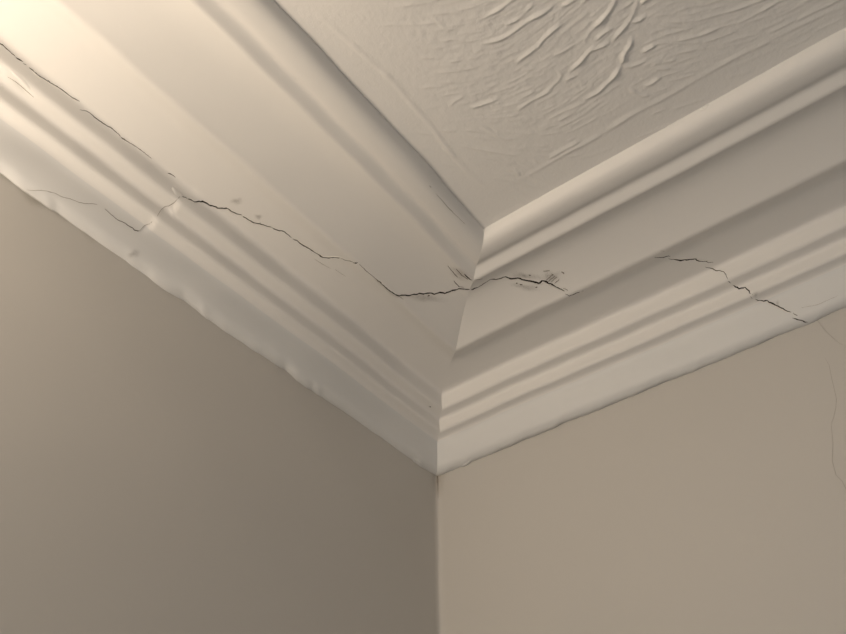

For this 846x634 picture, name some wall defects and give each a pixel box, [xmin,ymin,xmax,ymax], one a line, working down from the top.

crack [0,43,152,159]
crack [30,190,579,298]
crack [655,256,834,339]